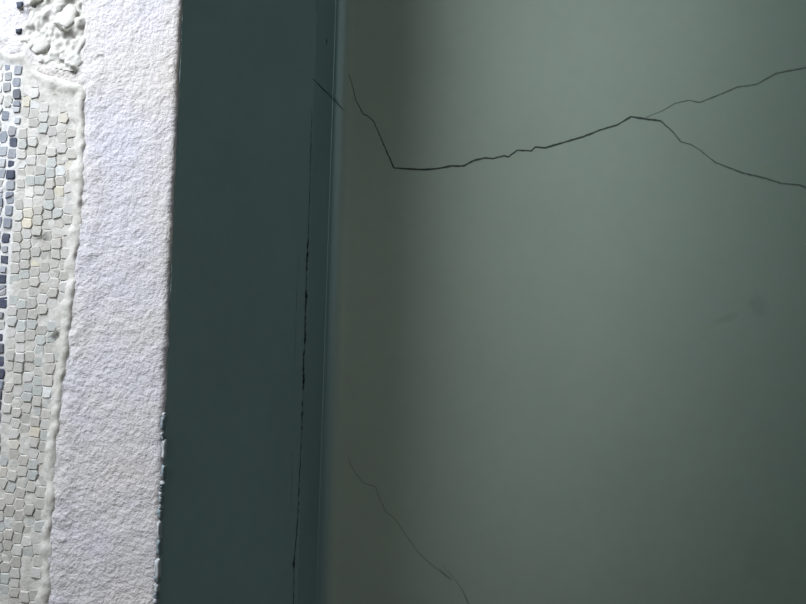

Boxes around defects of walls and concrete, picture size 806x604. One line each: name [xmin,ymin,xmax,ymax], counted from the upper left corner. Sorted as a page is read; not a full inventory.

crack [293,122,312,568]
crack [313,67,806,188]